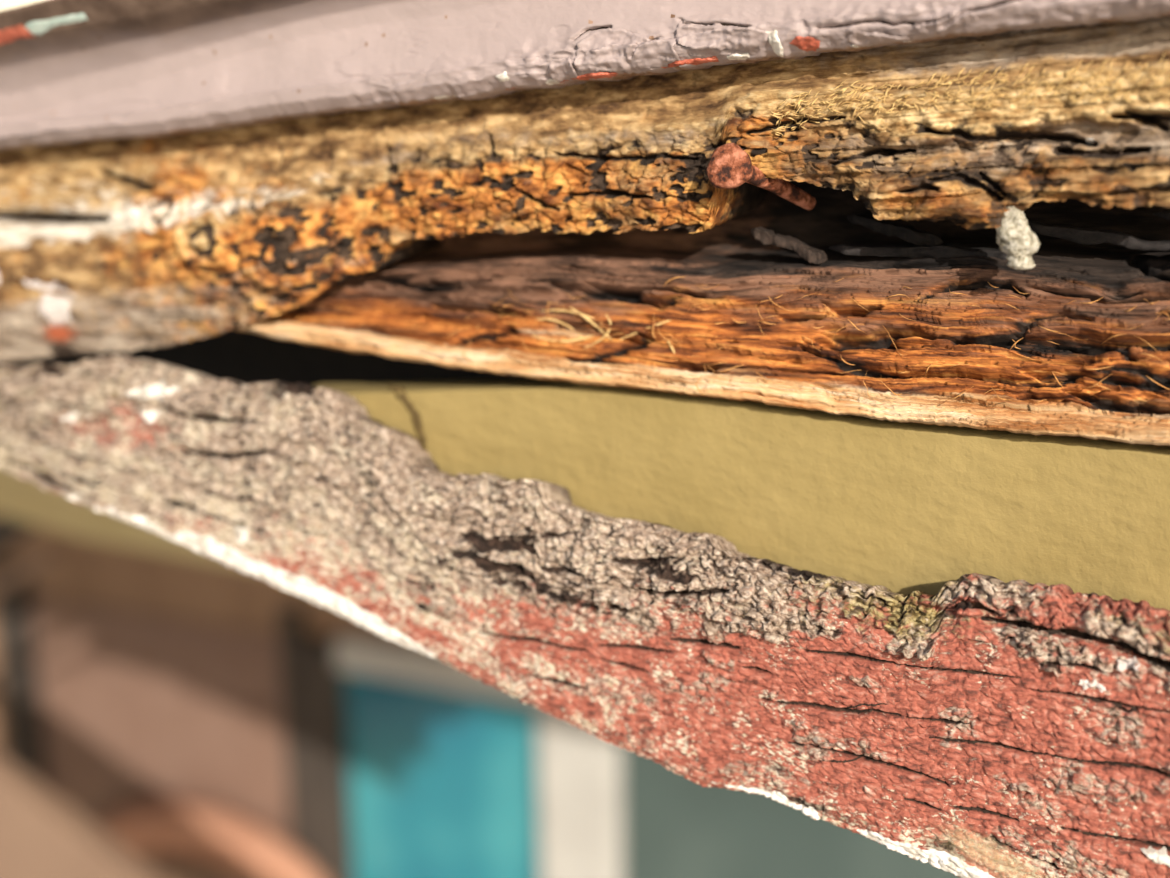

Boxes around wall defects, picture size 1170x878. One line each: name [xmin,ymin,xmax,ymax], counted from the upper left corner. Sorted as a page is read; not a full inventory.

crack [826,0,1015,28]
peeling [60,410,80,423]
peeling [126,380,181,424]
peeling [61,490,437,659]
crack [643,587,729,595]
crack [991,618,1162,660]
crack [805,649,1018,678]
crack [762,697,887,714]
crack [929,736,1170,776]
crack [817,745,1009,817]
crack [1082,832,1167,845]